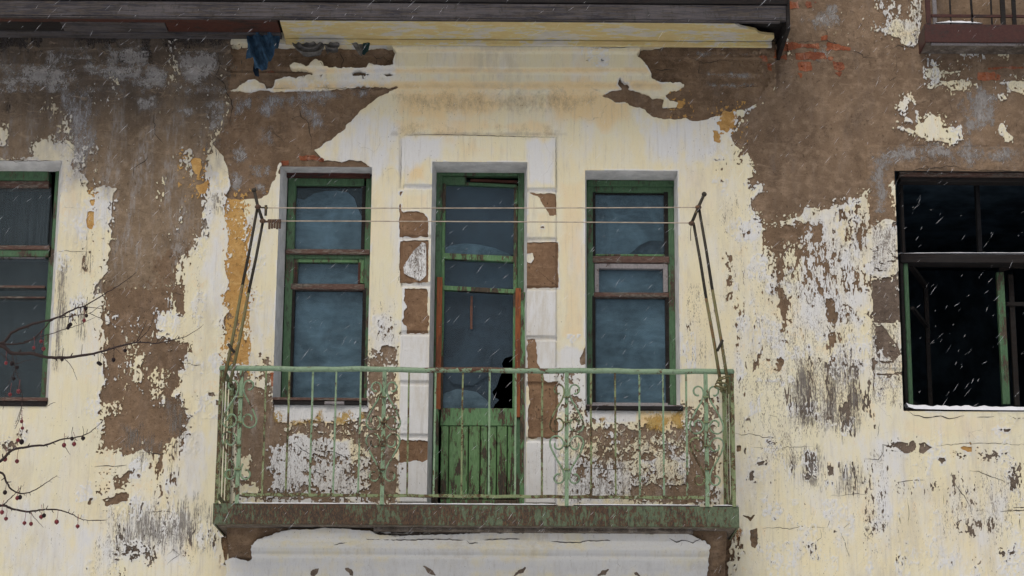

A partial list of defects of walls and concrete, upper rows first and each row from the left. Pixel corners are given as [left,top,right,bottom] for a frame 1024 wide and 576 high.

spalling [531,193,556,228]
peeling [603,0,1024,437]
spalling [527,242,559,289]
peeling [0,38,429,576]
peeling [526,339,721,506]
leakage [789,361,864,439]
leakage [787,448,821,486]
leakage [836,461,867,496]
peeling [791,436,1022,562]